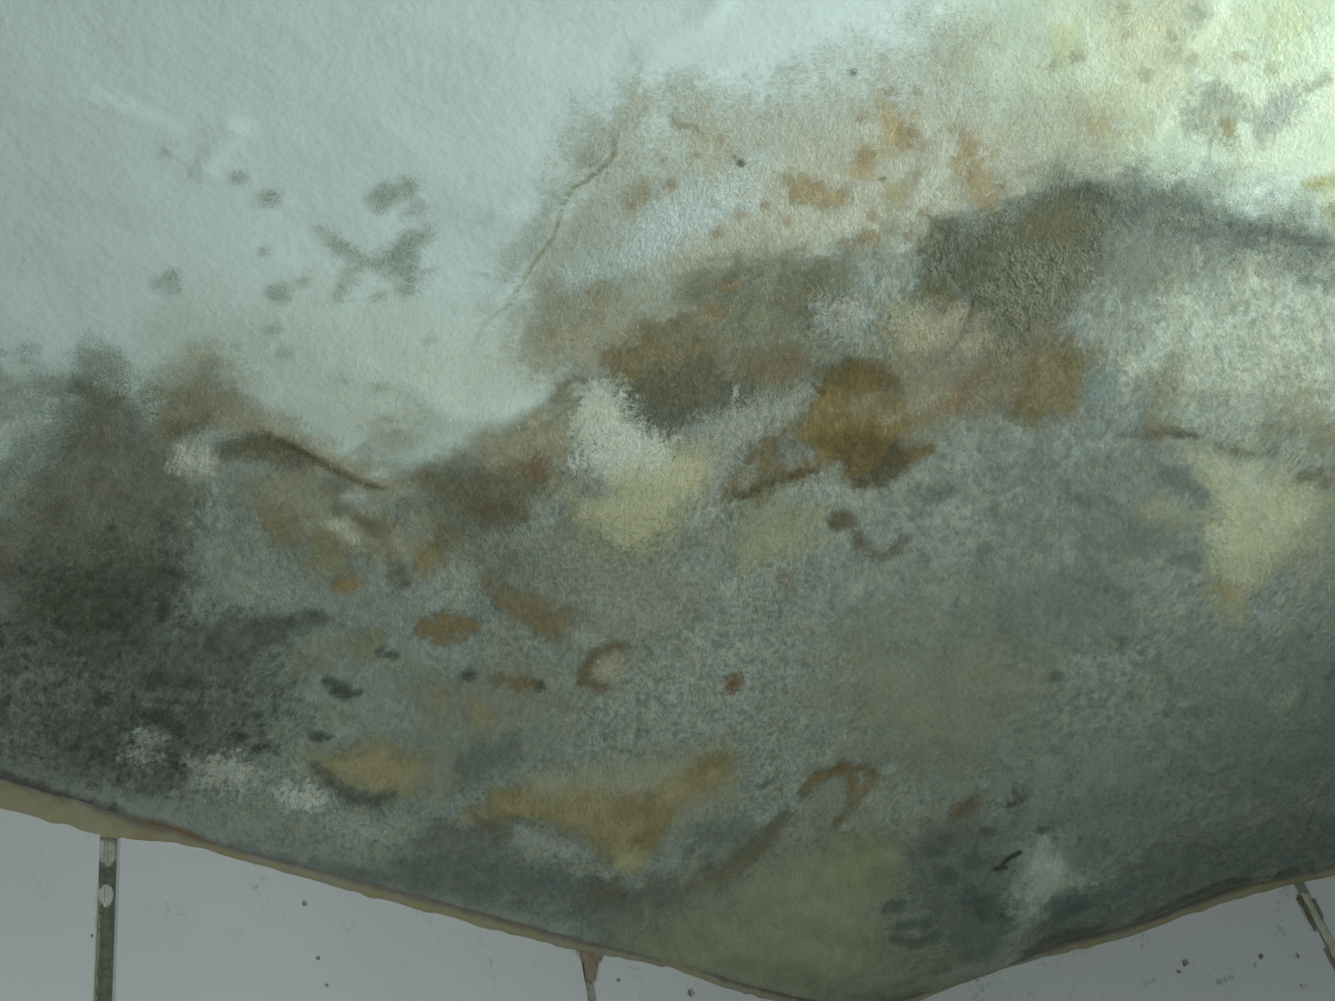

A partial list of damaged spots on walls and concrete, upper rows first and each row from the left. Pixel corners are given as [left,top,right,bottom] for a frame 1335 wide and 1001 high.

crack [471,68,642,354]
water stain [91,840,116,1001]
water stain [1295,893,1335,971]